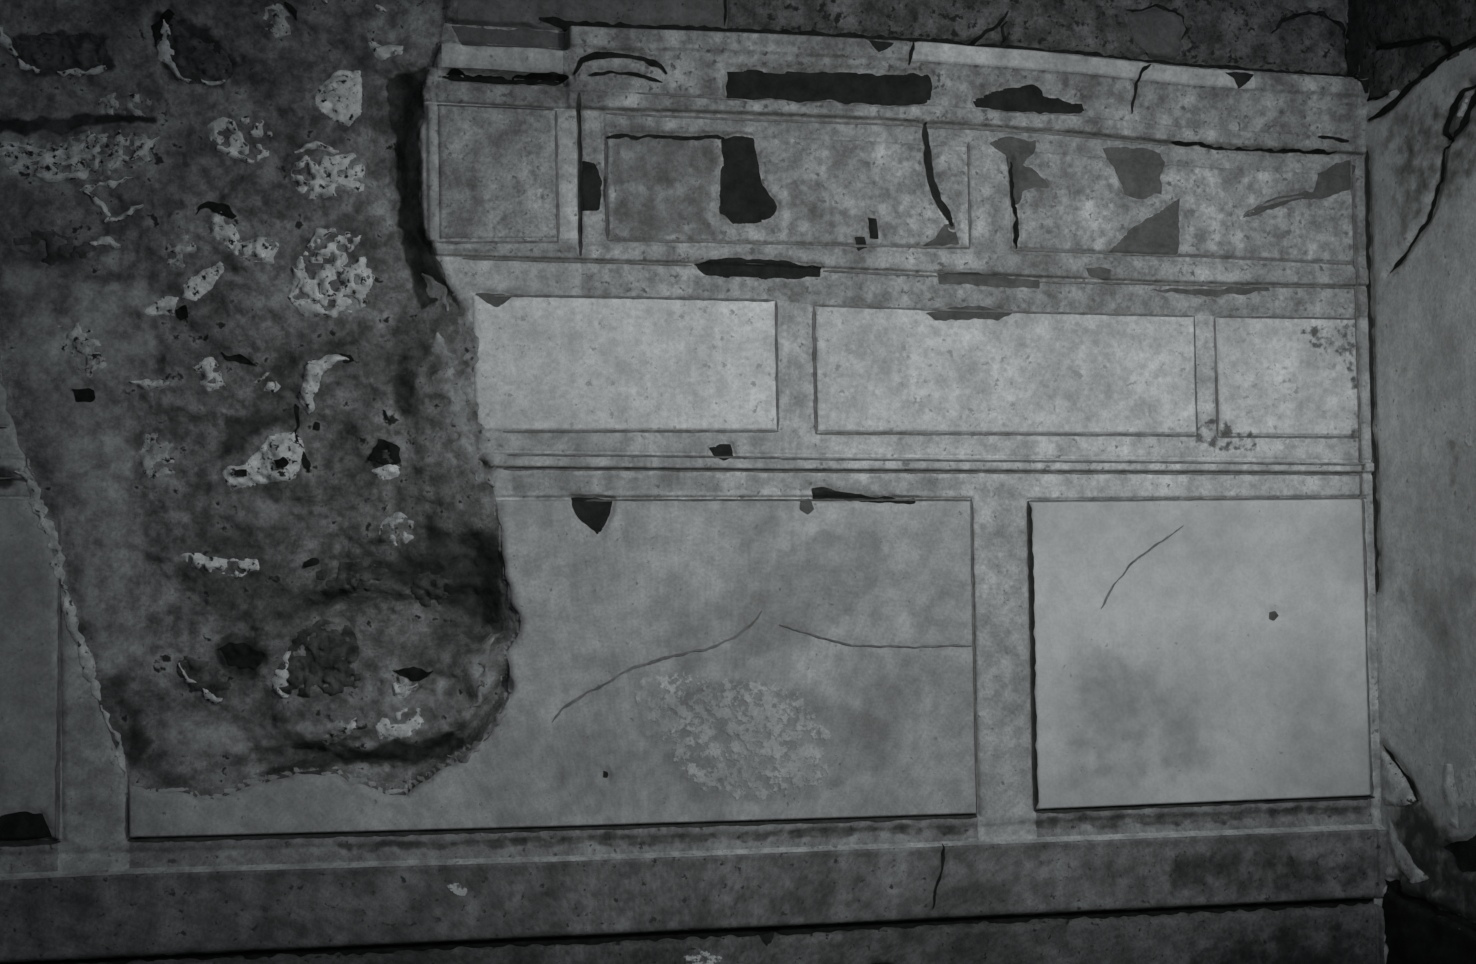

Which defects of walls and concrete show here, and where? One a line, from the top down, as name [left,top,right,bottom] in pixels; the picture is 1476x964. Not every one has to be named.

flaking render [726,70,933,106]
flaking render [869,40,894,52]
flaking render [973,84,1084,114]
flaking render [719,136,777,224]
flaking render [1086,147,1180,280]
crack [442,0,1476,592]
flaking render [0,0,565,799]
crack [1101,525,1184,609]
crack [552,610,973,722]
damp [635,672,831,800]
flaking render [0,811,52,840]
flaking render [1381,750,1470,964]